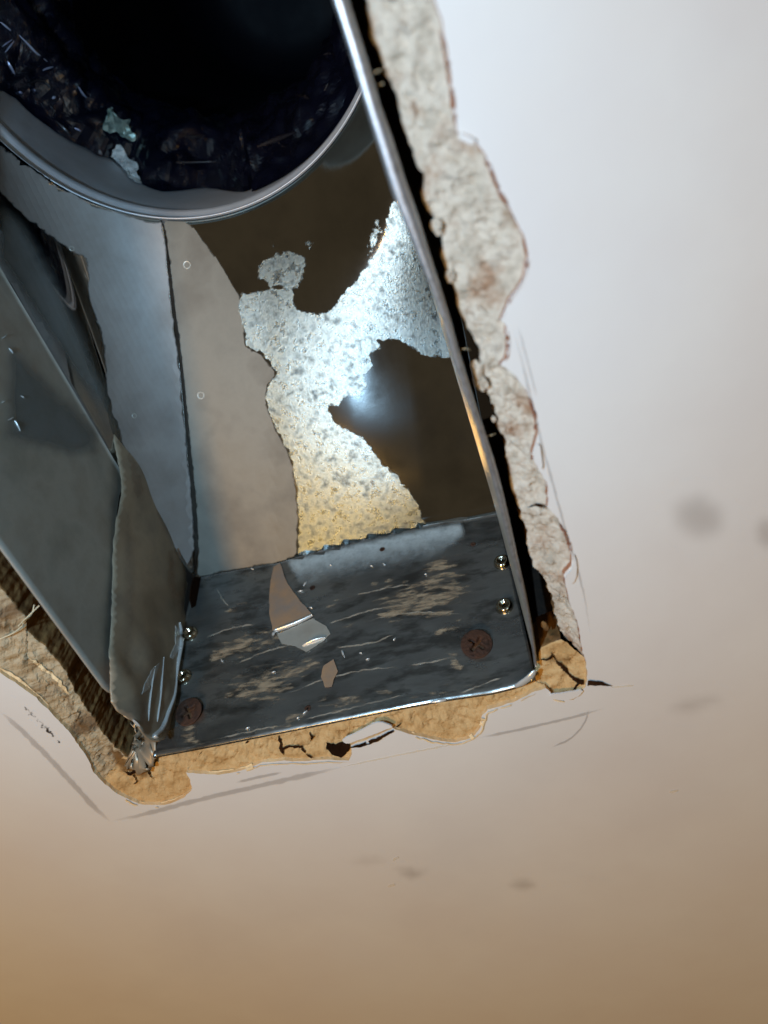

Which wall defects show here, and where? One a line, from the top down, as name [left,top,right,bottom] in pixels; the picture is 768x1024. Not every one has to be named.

spalling [0,0,586,808]
crack [278,732,314,758]
crack [350,724,400,748]